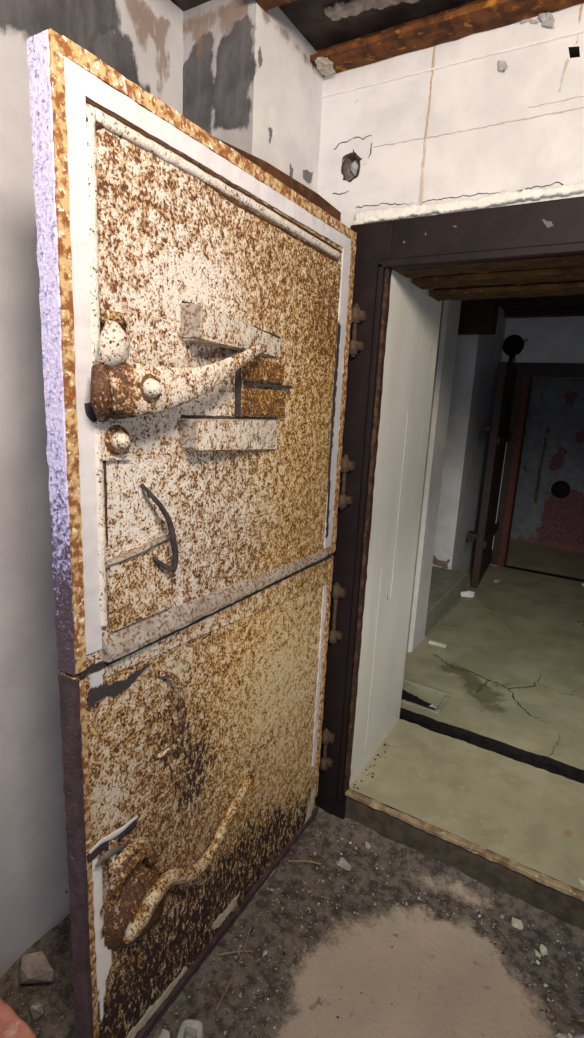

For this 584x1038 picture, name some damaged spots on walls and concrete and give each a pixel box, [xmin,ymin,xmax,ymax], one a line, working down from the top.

corrosion [423,45,436,153]
hole [333,135,372,195]
peeling [510,490,584,552]
crack [433,654,582,758]